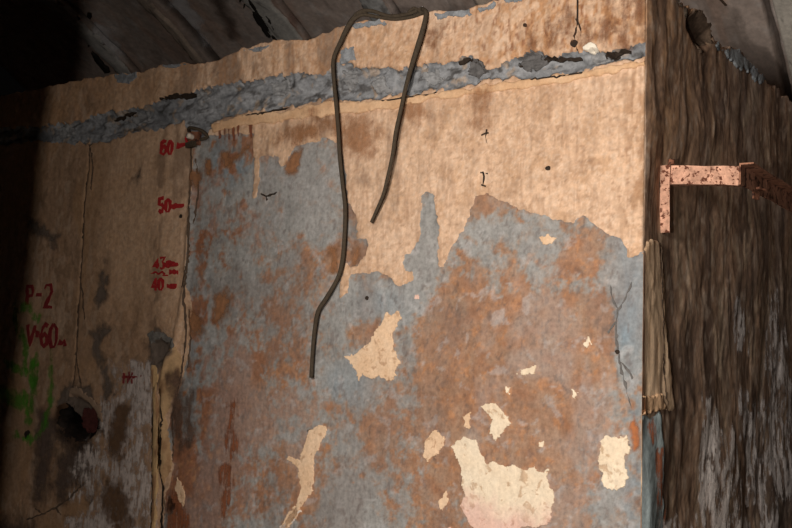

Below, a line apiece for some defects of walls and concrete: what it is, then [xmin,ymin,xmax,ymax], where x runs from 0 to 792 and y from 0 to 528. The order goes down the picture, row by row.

spalling [345,19,387,29]
spalling [434,0,522,20]
crack [68,144,94,400]
crack [180,148,199,378]
peeling [0,40,675,528]
damp [34,324,194,528]
crack [168,415,176,457]
rust [218,400,238,517]